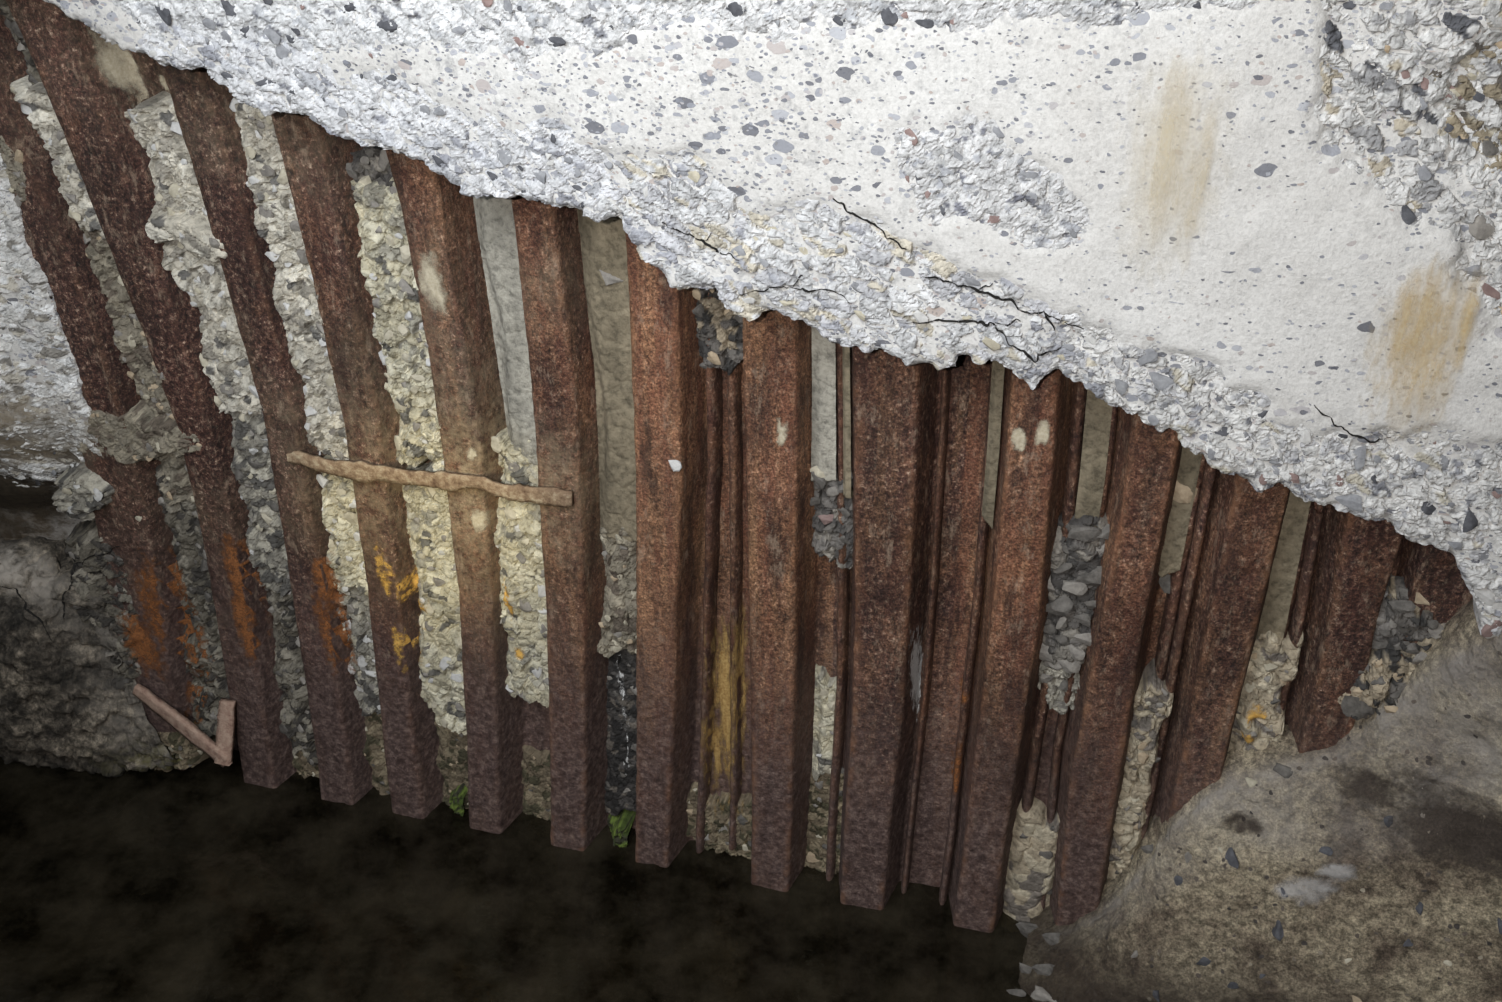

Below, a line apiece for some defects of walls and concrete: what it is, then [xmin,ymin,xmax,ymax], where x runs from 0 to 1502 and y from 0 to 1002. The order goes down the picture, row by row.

spalling [0,154,102,491]
spalling [112,0,1502,637]
crack [833,198,1084,363]
rust [122,555,209,722]
rust [223,534,264,658]
rust [311,558,356,671]
rust [375,546,424,611]
rust [392,628,421,664]
rust [702,622,746,801]